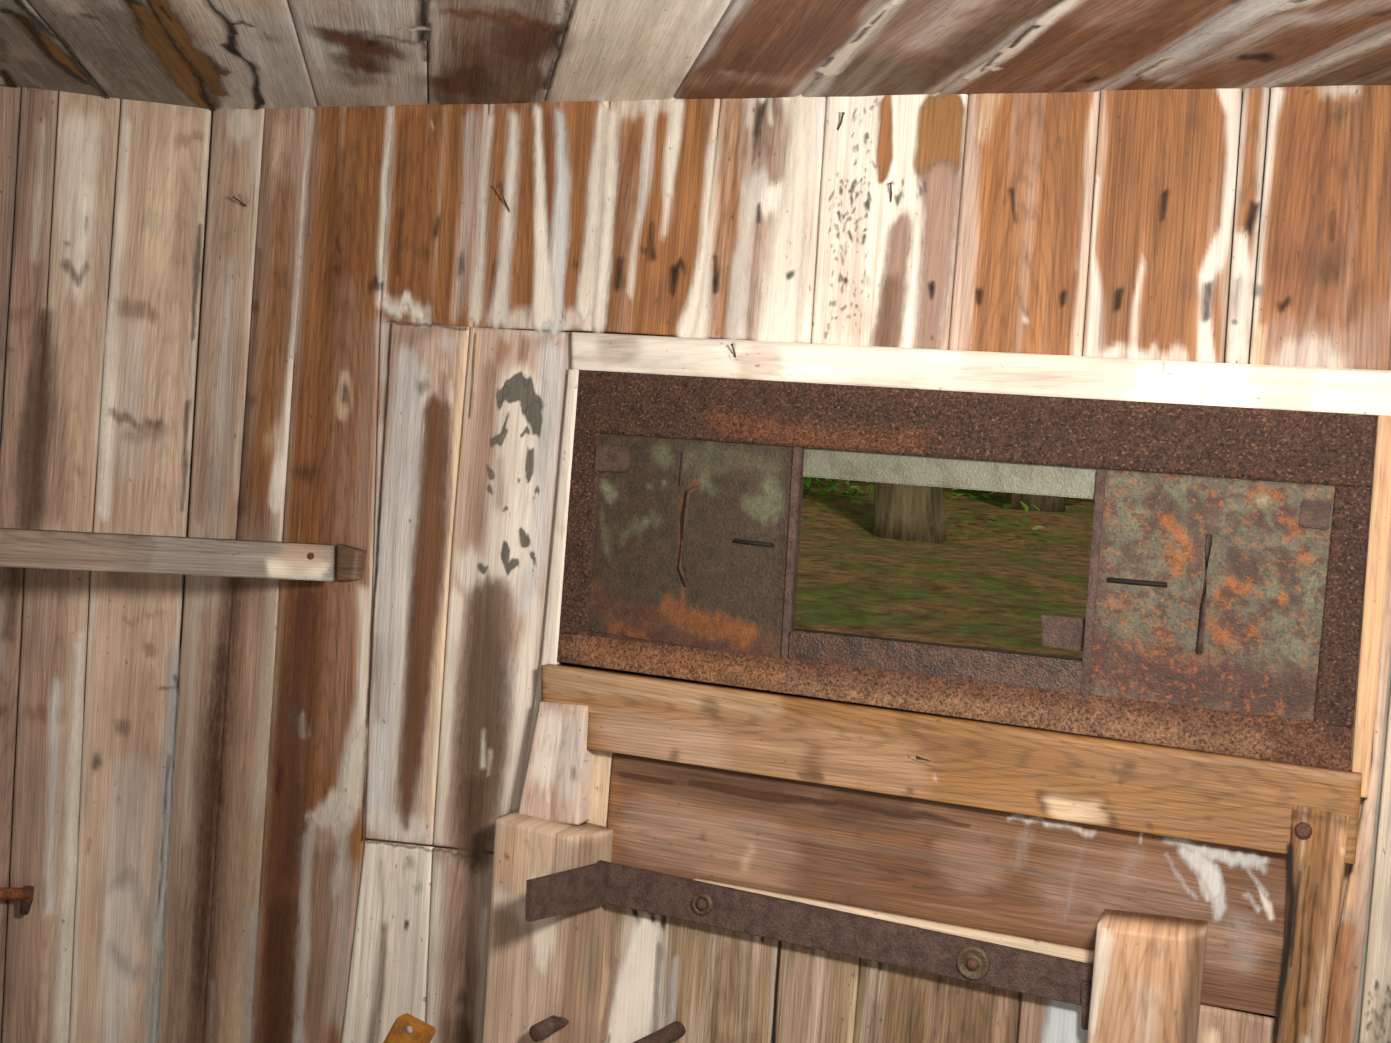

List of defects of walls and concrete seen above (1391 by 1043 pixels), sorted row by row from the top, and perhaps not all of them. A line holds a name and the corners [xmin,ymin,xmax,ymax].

crack [207,0,265,110]
peeling [491,372,542,493]